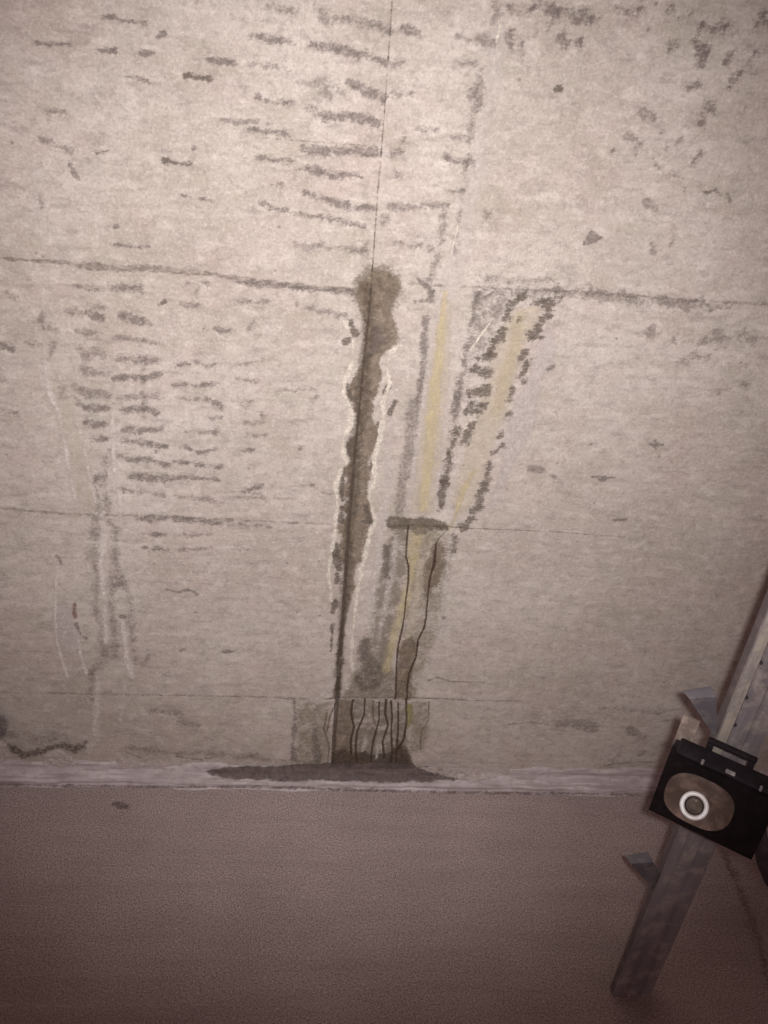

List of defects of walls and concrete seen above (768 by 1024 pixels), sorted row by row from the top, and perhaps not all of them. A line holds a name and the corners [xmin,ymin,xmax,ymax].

crack [331,188,379,763]
water stain [206,22,562,783]